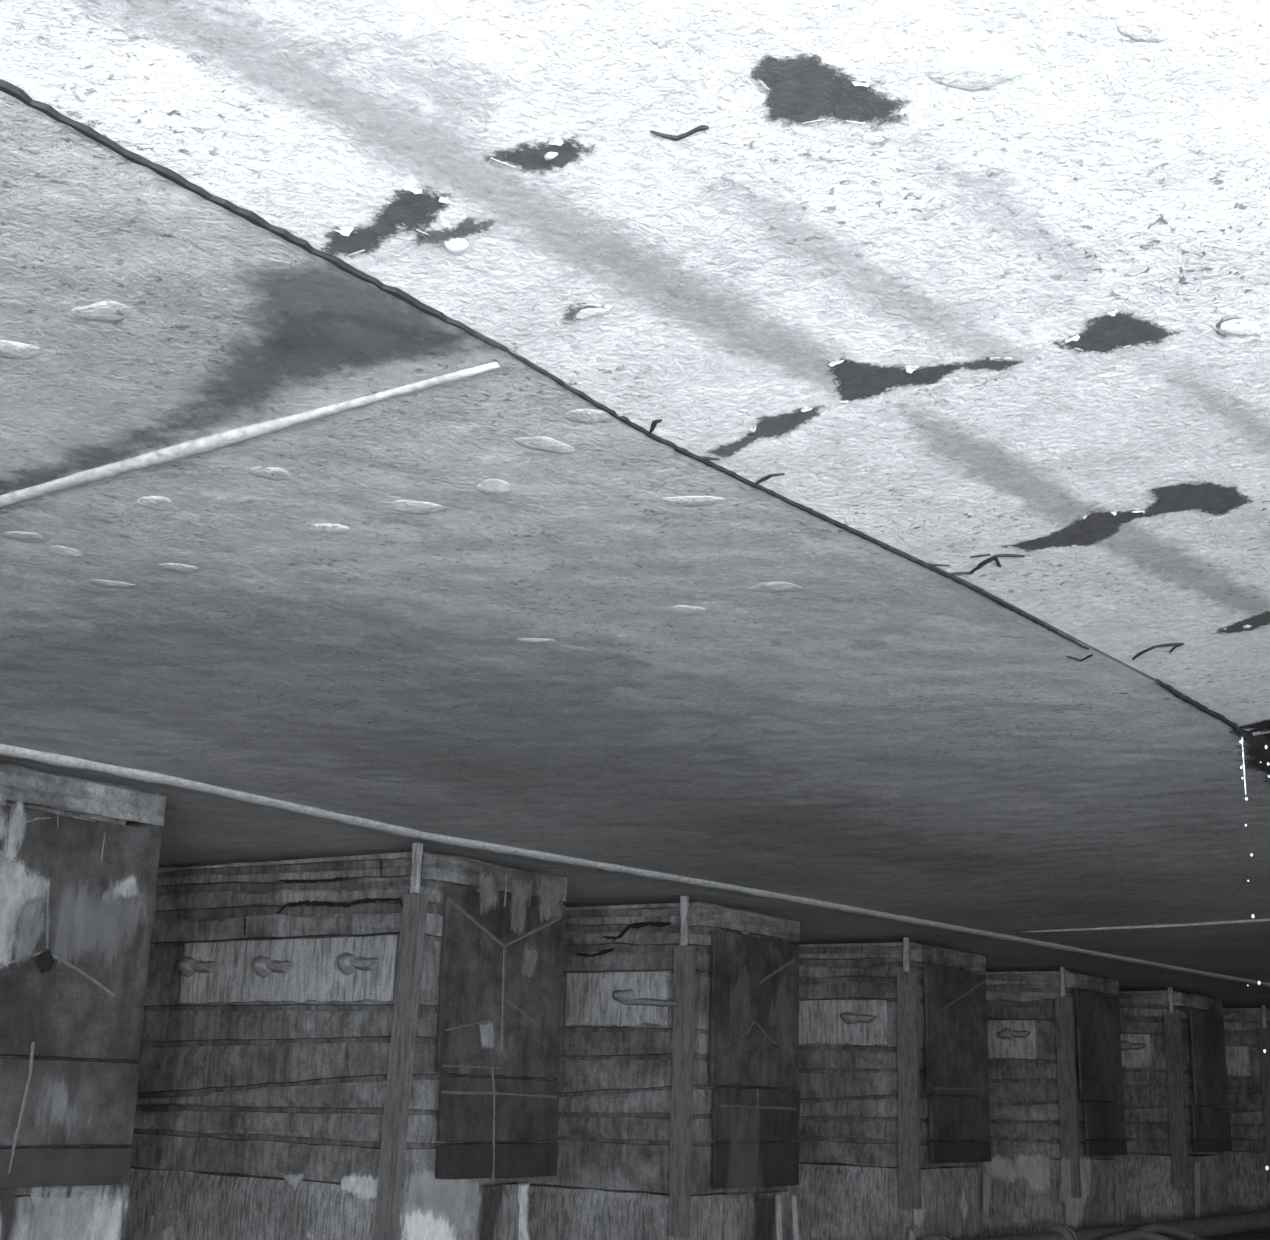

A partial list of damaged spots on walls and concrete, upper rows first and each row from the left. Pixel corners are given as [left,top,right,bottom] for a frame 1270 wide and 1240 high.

peeling [751,53,909,126]
peeling [321,185,494,256]
damp [134,0,829,373]
peeling [485,137,594,174]
peeling [1054,310,1179,353]
damp [0,269,457,495]
peeling [827,357,1023,403]
peeling [708,406,823,457]
peeling [1004,482,1252,551]
damp [1238,720,1270,782]